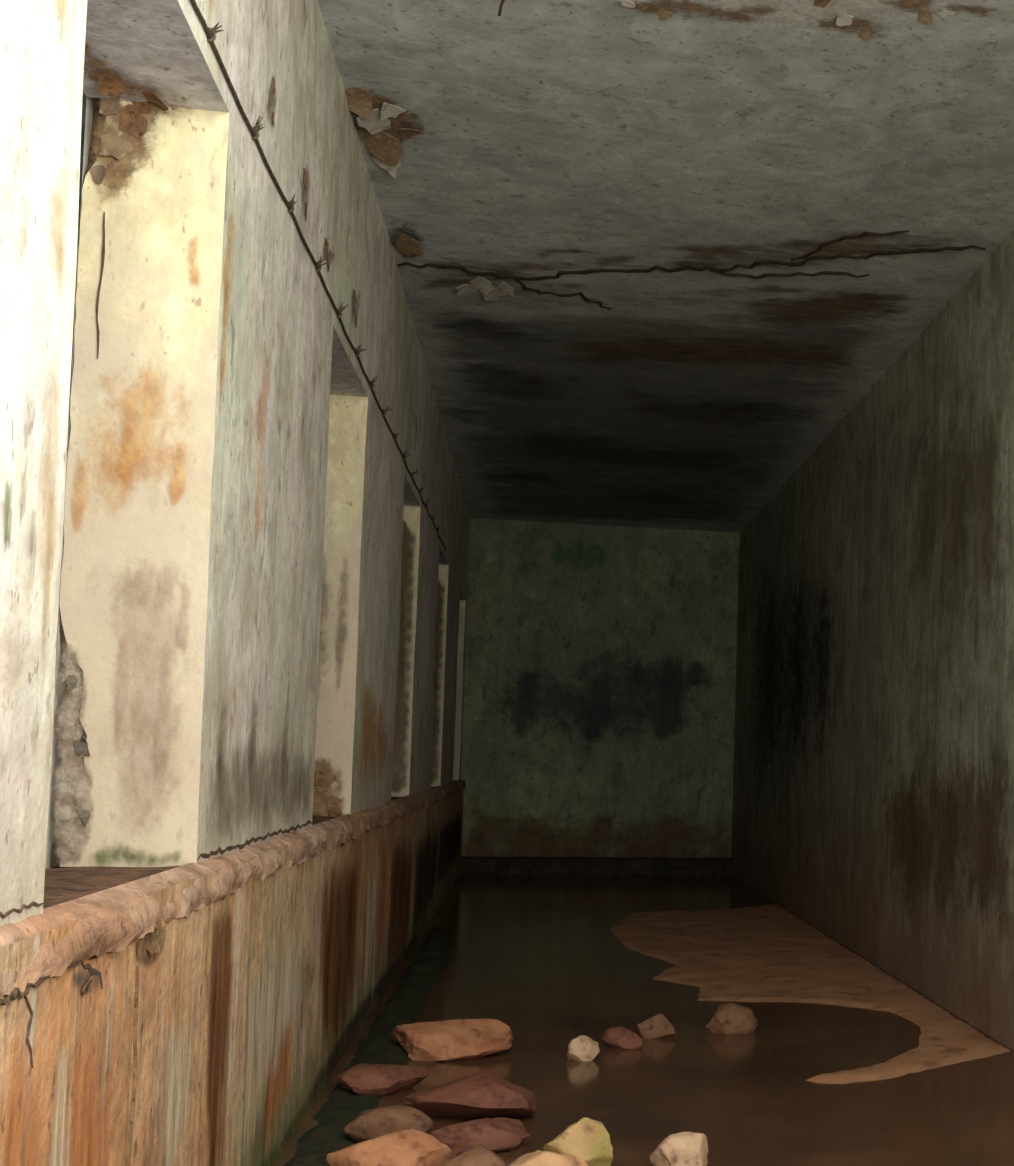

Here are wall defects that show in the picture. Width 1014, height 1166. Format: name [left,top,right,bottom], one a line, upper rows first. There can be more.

peeling [621,0,933,41]
peeling [948,5,989,16]
spalling [84,43,179,196]
spalling [345,87,425,178]
crack [397,230,986,309]
rust [103,378,184,500]
spalling [54,644,93,863]
spalling [312,760,343,817]
crack [0,901,45,919]
crack [0,960,103,1068]